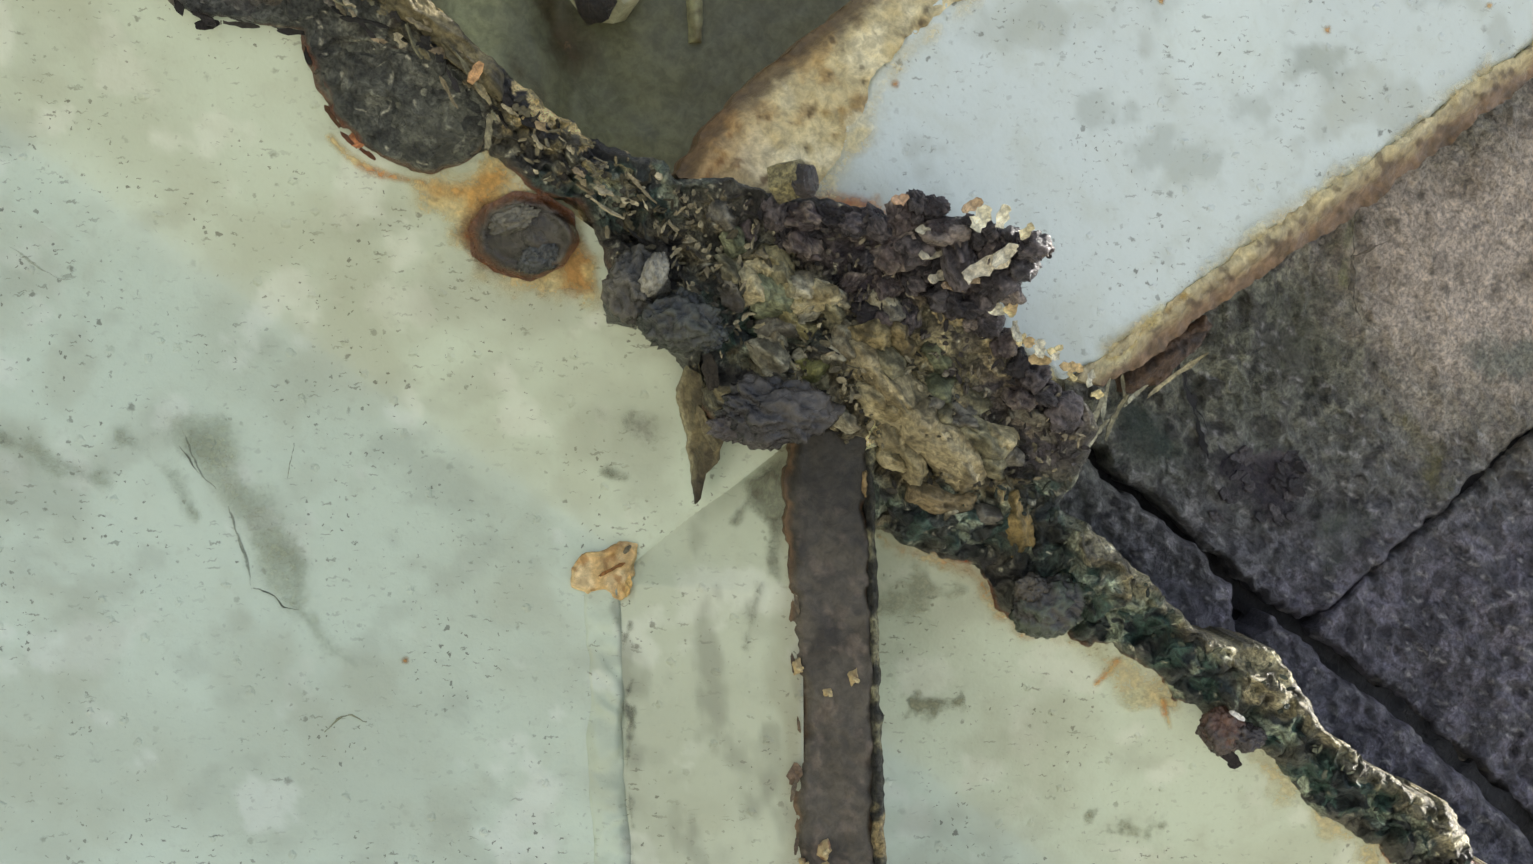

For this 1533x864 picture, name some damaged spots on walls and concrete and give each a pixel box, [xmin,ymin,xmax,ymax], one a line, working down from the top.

rust [168,0,549,161]
rust [330,137,409,181]
peeling [891,193,910,206]
peeling [915,197,1035,292]
rust [374,0,1533,864]
crack [1423,430,1530,524]
crack [1088,448,1533,847]